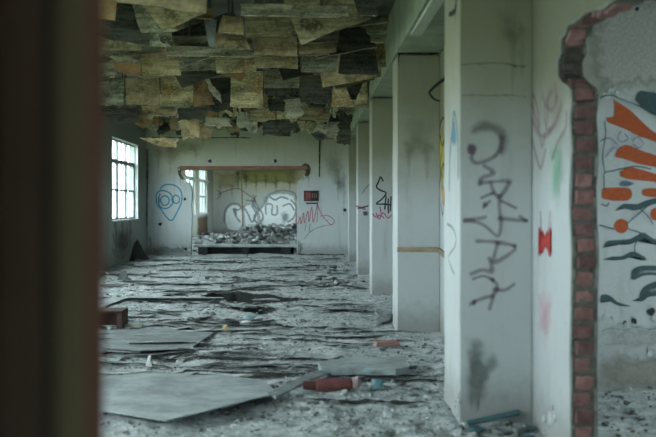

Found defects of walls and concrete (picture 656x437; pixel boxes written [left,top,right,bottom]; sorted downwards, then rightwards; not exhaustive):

water stain [242,170,296,183]
spalling [556,0,656,437]
water stain [469,357,486,397]